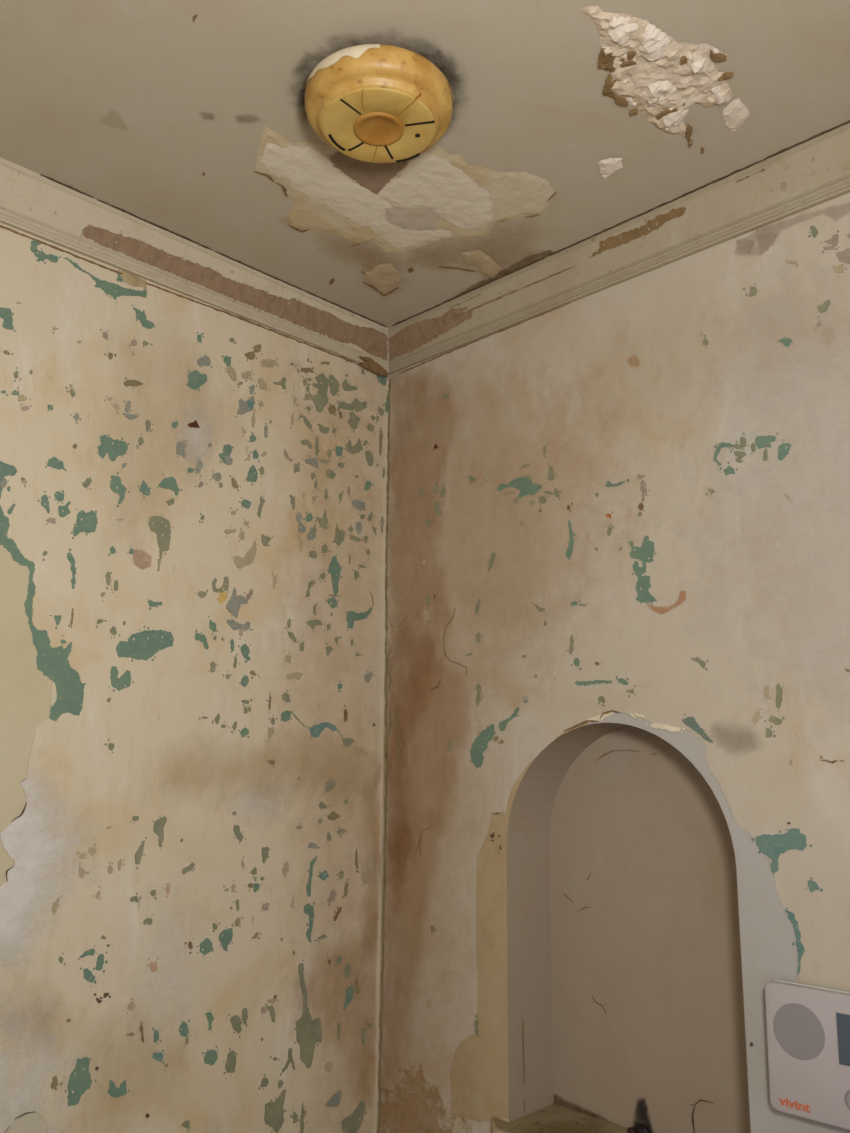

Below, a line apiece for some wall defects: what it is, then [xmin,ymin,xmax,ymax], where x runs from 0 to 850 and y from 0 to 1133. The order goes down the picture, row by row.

flaking render [581,6,750,153]
peeling [30,241,155,356]
flaking render [254,126,556,297]
peeling [590,207,686,257]
peeling [808,225,850,277]
peeling [1,350,33,411]
peeling [45,457,67,472]
peeling [82,225,481,742]
peeling [108,815,167,874]
peeling [290,776,381,943]
peeling [557,635,850,1133]
peeling [78,935,111,1004]